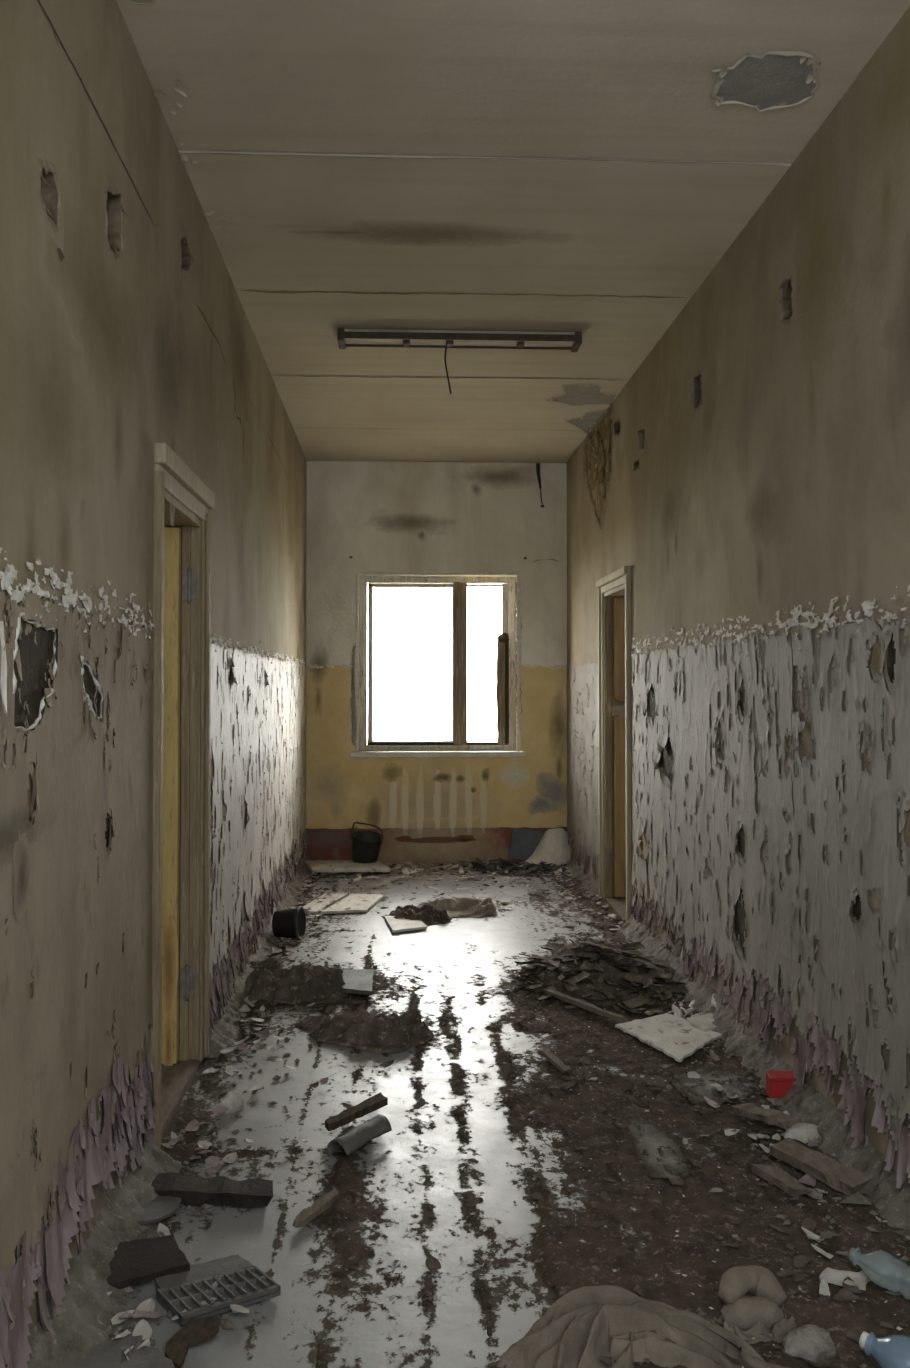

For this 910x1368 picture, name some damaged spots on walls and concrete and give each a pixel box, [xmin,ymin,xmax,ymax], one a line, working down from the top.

peeling [709,51,822,112]
hole [36,157,65,262]
hole [104,182,125,260]
damp [246,217,613,249]
spalling [544,383,646,529]
peeling [209,634,598,1040]
damp [306,758,518,863]
peeling [629,585,910,1189]
peeling [0,548,159,1368]
peeling [466,1197,483,1206]
peeling [425,1255,441,1272]
peeling [846,1327,870,1343]